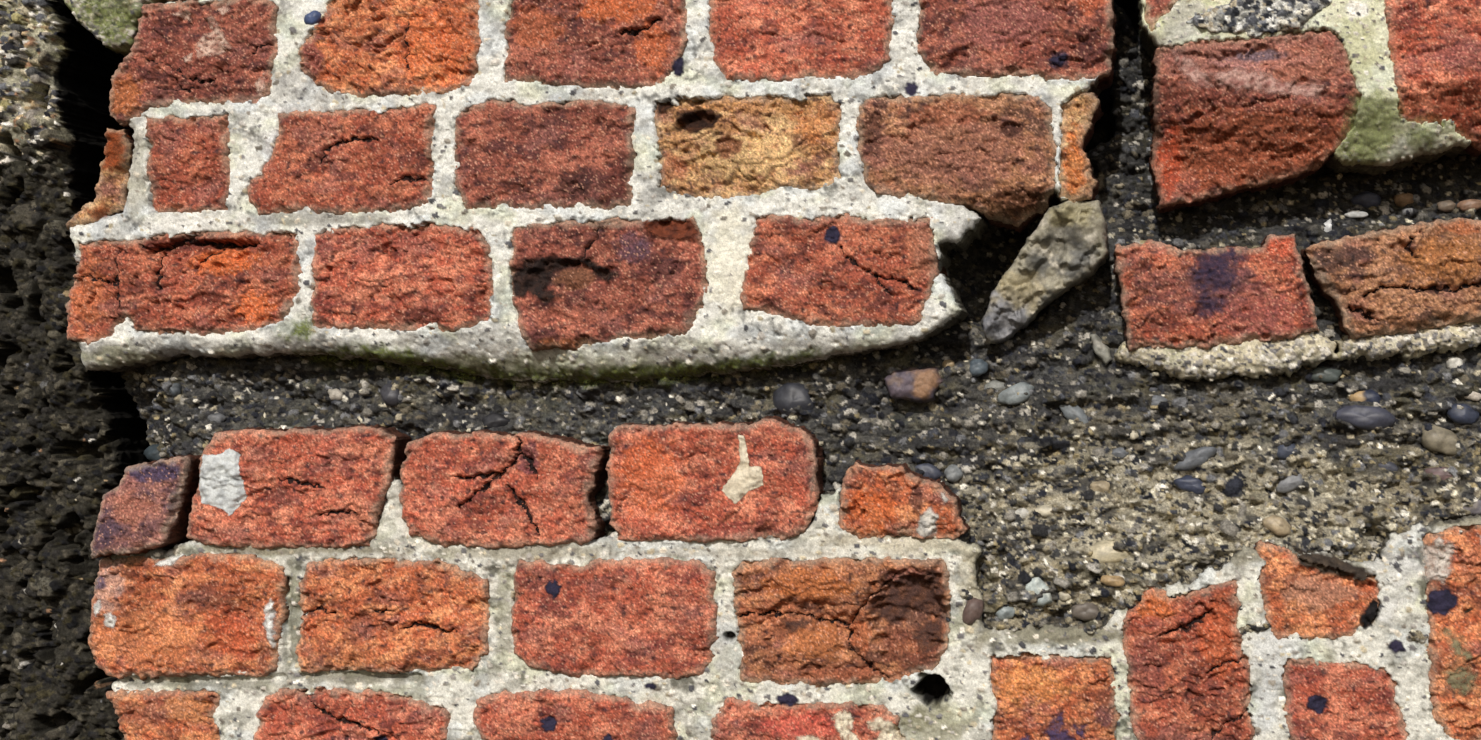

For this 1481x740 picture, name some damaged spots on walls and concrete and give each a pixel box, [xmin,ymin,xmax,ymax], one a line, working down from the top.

crack [840,246,924,296]
crack [454,438,539,533]
spalling [1295,549,1376,581]
spalling [784,620,812,632]
spalling [879,571,944,653]